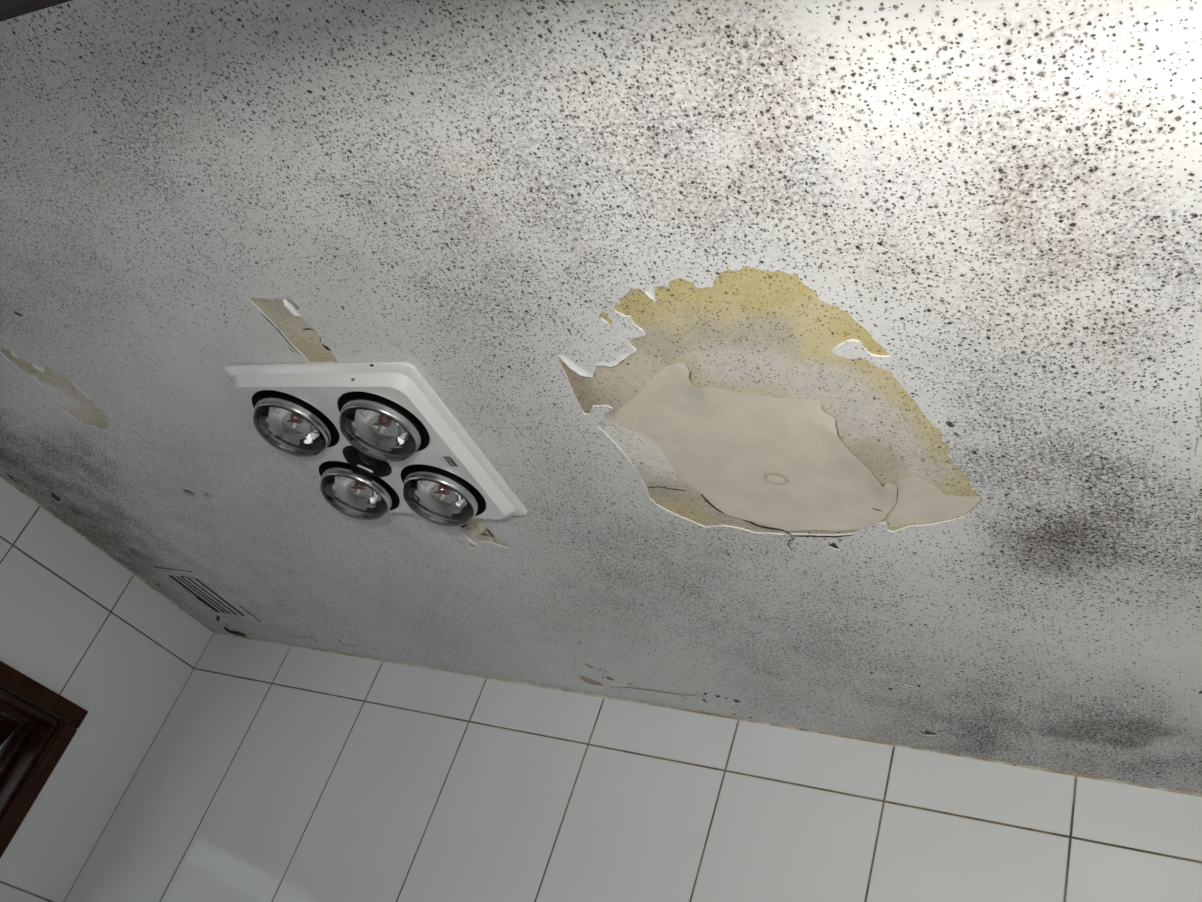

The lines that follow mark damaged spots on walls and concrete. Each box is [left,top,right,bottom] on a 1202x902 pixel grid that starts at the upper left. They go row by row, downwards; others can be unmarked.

peeling [249,298,338,362]
peeling [0,349,109,430]
peeling [558,267,982,549]
crack [1194,376,1202,461]
water stain [987,509,1123,584]